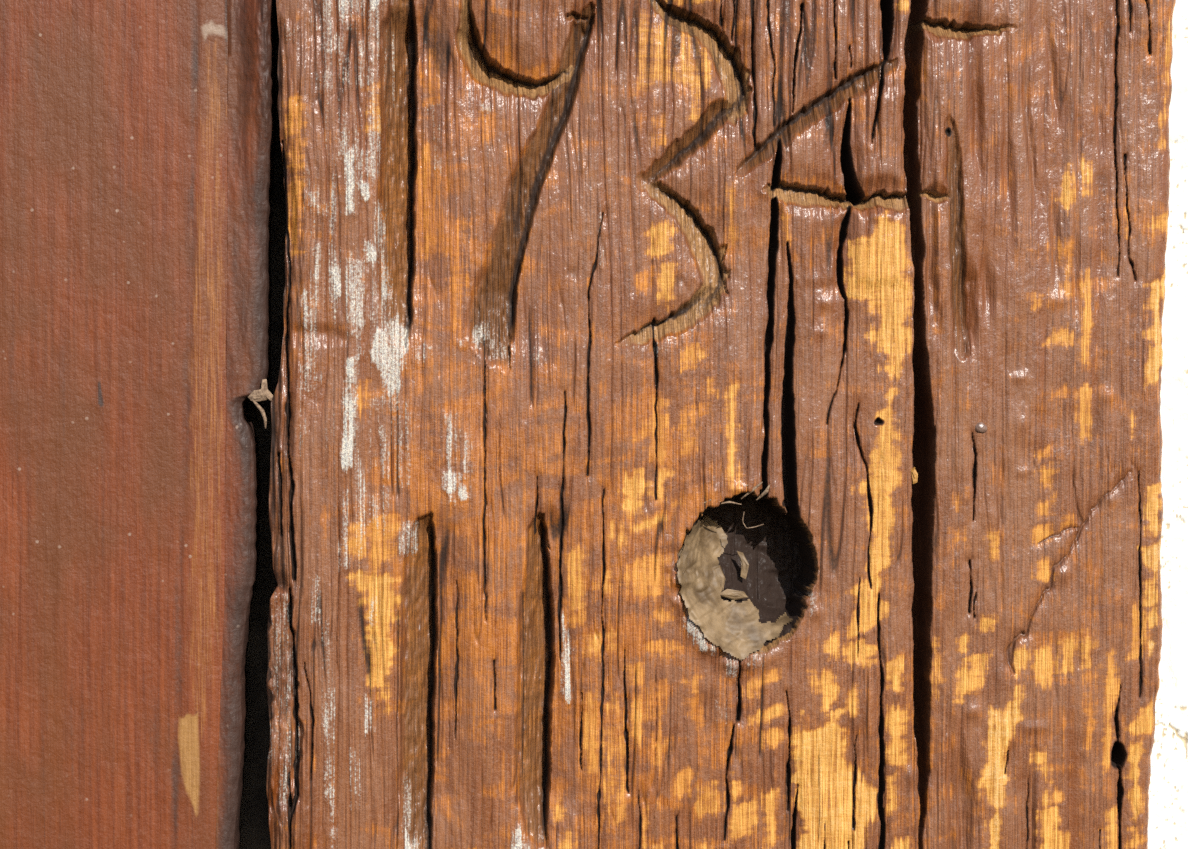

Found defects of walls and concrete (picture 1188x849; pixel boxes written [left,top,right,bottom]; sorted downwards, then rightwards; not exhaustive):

peeling [415,140,439,268]
crack [533,210,643,849]
peeling [549,593,726,849]
peeling [556,335,724,616]
crack [650,317,660,502]
crack [718,0,941,849]
peeling [799,628,911,723]
crack [967,560,978,620]
crack [970,433,978,521]
crack [1004,470,1144,849]
peeling [1094,798,1149,849]
peeling [1122,470,1188,764]